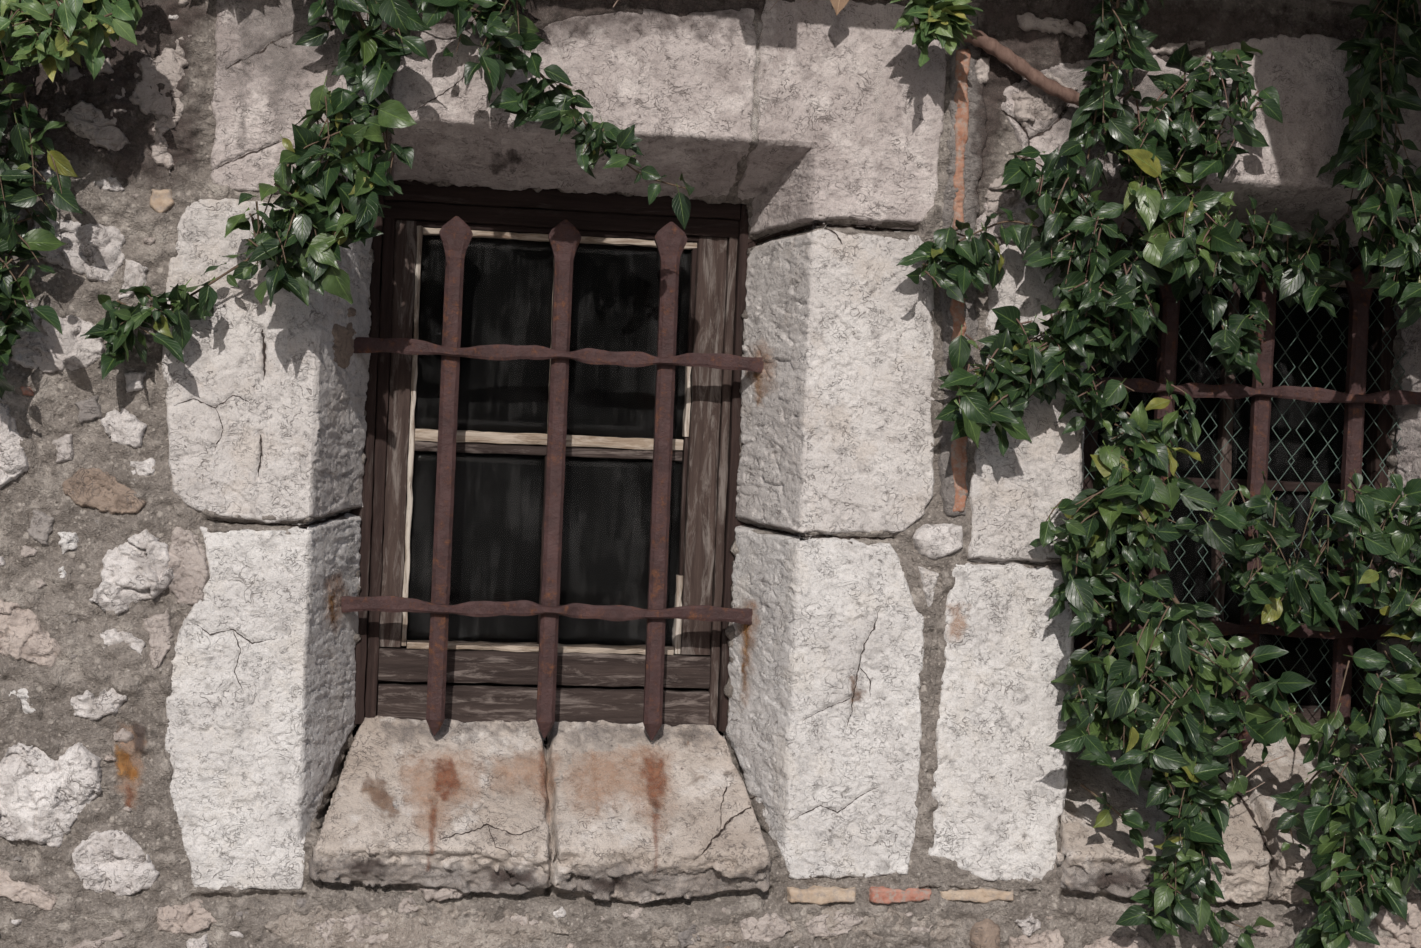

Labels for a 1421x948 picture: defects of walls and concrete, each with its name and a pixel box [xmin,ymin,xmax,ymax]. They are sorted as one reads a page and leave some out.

flaking render [168,0,189,20]
flaking render [61,35,192,176]
crack [176,329,266,474]
spalling [21,545,37,558]
crack [803,609,880,728]
spalling [104,728,134,762]
corrosion [409,755,470,853]
corrosion [578,748,667,838]
crack [694,786,762,860]
crack [798,788,875,817]
spalling [230,911,248,938]
spalling [1256,921,1284,939]